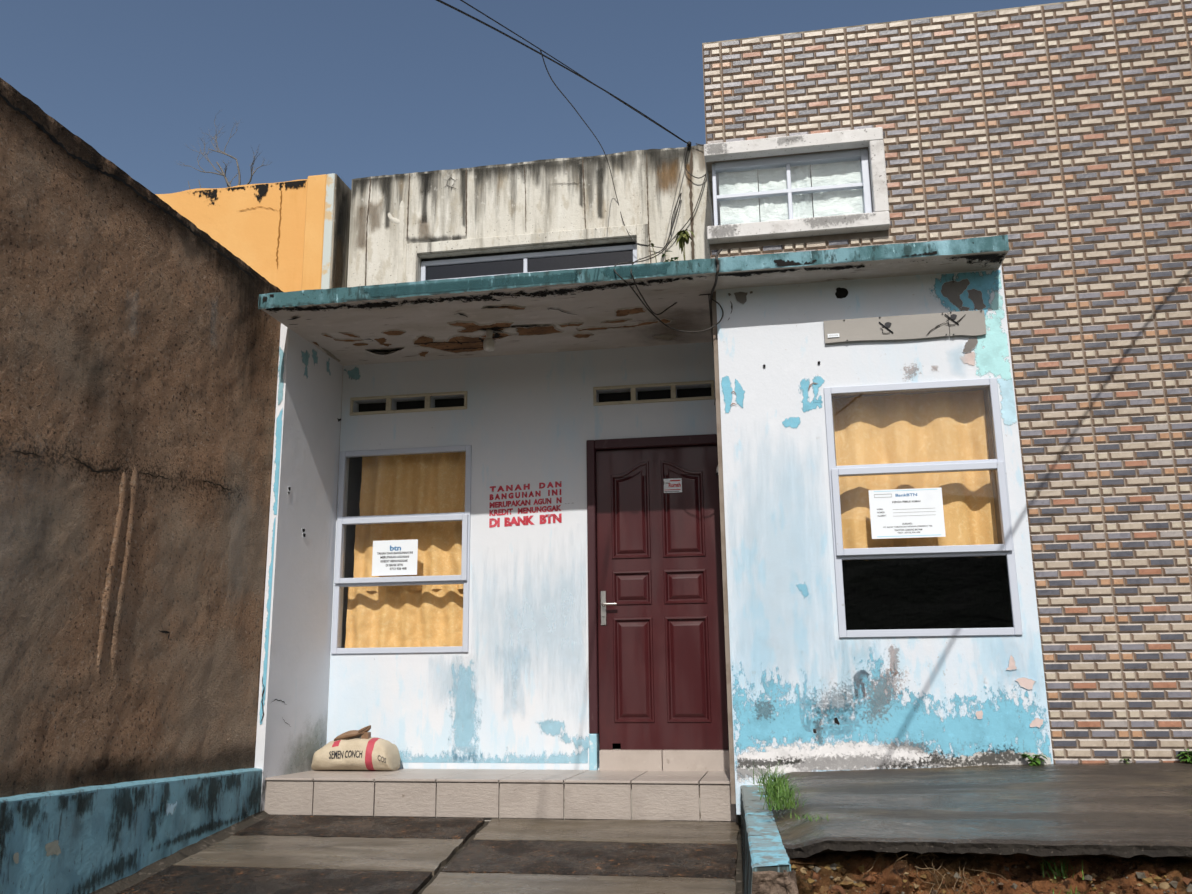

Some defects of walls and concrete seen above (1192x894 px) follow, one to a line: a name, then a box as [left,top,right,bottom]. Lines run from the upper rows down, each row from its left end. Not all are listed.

leakage [193,180,306,206]
leakage [333,176,397,288]
flaking render [353,304,673,357]
leakage [408,154,624,243]
leakage [217,252,865,340]
peeling [929,270,1017,425]
leakage [949,254,1005,270]
peeling [721,376,745,413]
peeling [782,376,824,429]
crack [0,432,247,511]
peeling [732,650,1052,782]
leakage [0,752,267,894]